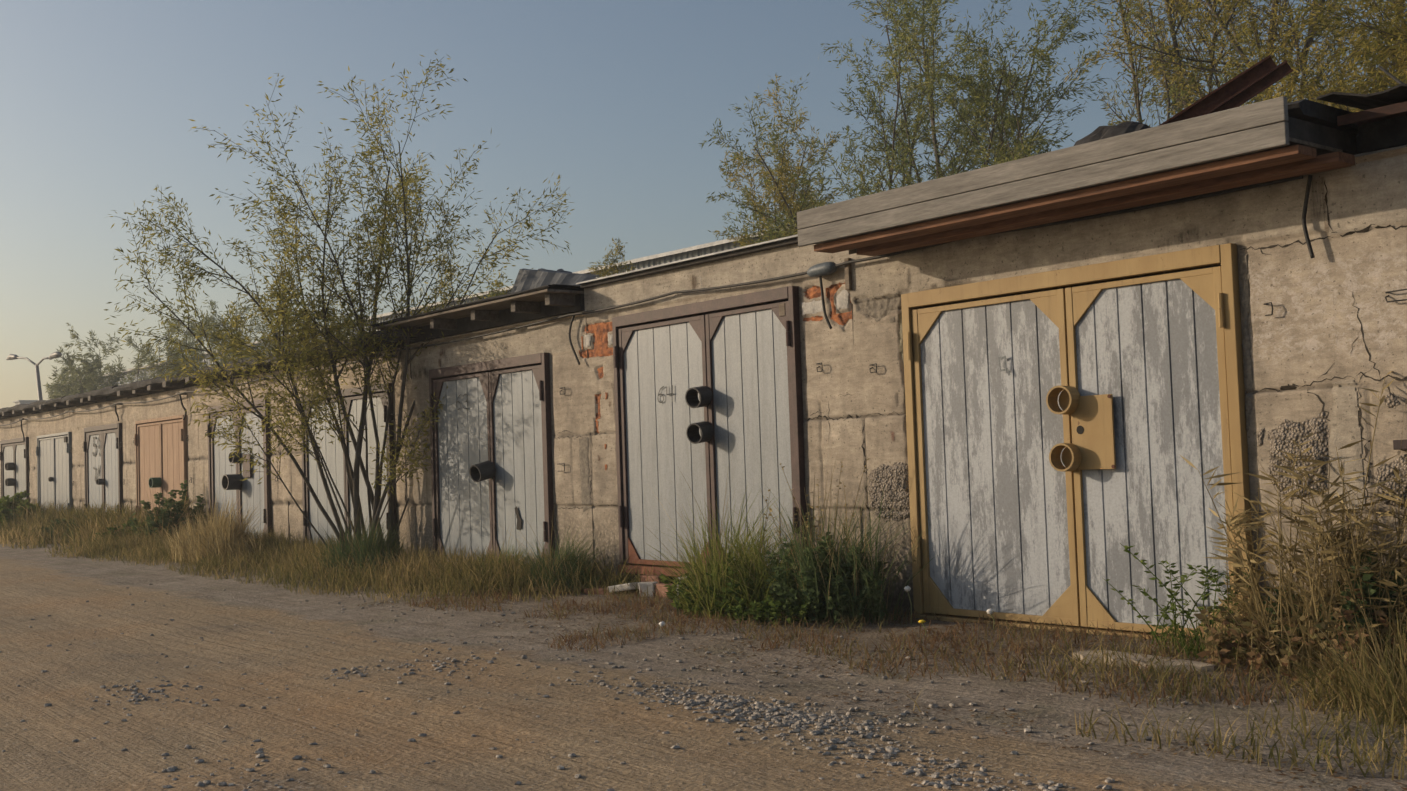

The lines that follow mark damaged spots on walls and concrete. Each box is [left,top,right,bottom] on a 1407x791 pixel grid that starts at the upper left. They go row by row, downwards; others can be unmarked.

crack [1240,180,1407,255]
flaking render [579,322,613,470]
flaking render [802,283,906,416]
spalling [1238,252,1329,500]
spalling [868,462,910,522]
spalling [1375,454,1407,511]